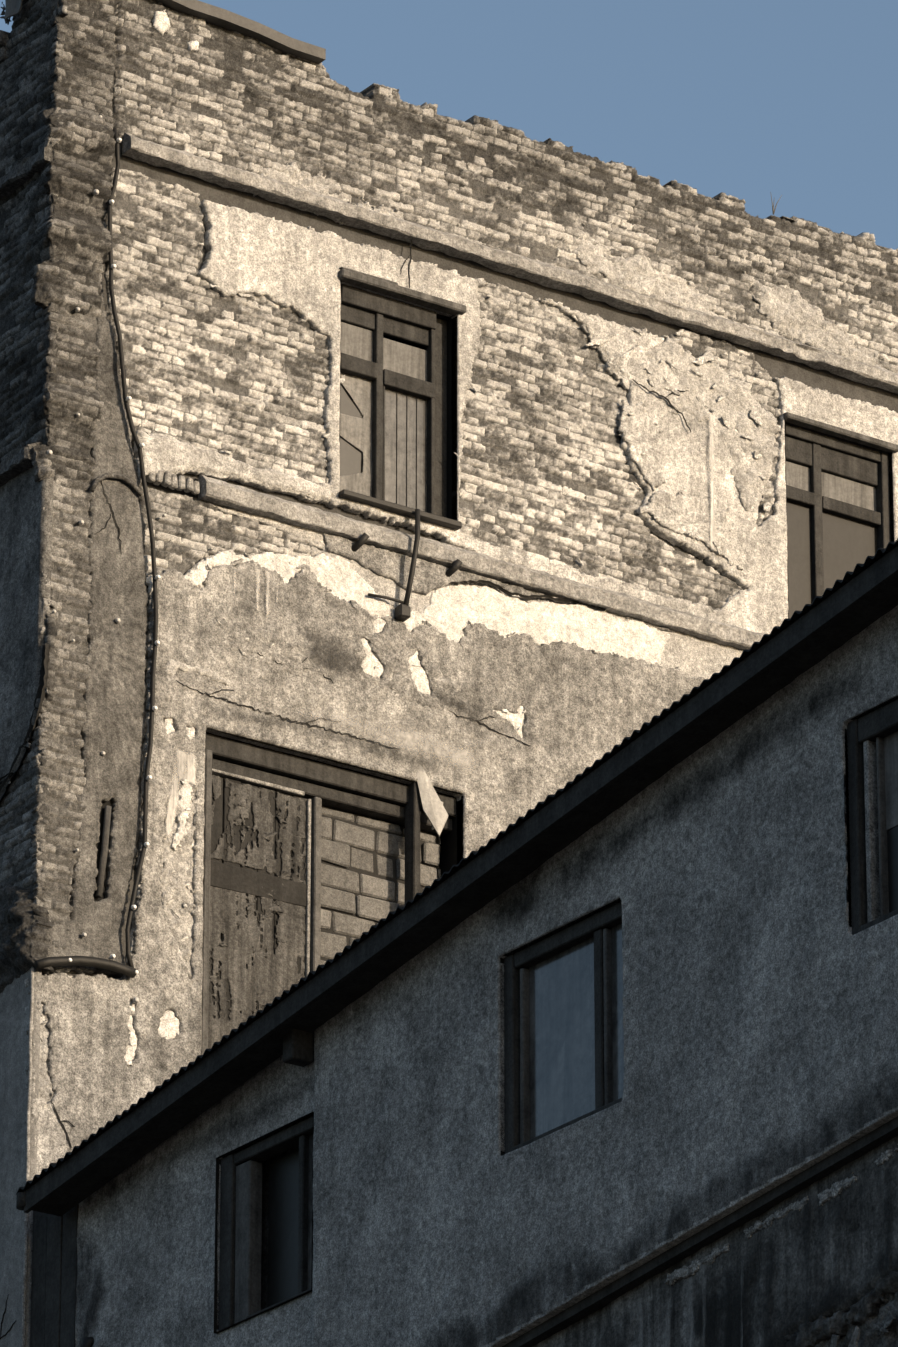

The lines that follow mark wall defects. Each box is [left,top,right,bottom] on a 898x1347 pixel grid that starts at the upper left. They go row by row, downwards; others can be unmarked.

flaking render [104,168,345,485]
flaking render [453,283,782,611]
peeling [138,486,671,717]
crack [449,580,606,611]
peeling [159,775,307,1049]
peeling [150,1011,180,1039]
crack [50,1101,75,1148]
leakage [708,1079,898,1206]
crack [0,1295,16,1339]
leakage [437,1282,539,1347]
leakage [564,1207,694,1299]
leakage [689,1243,788,1347]